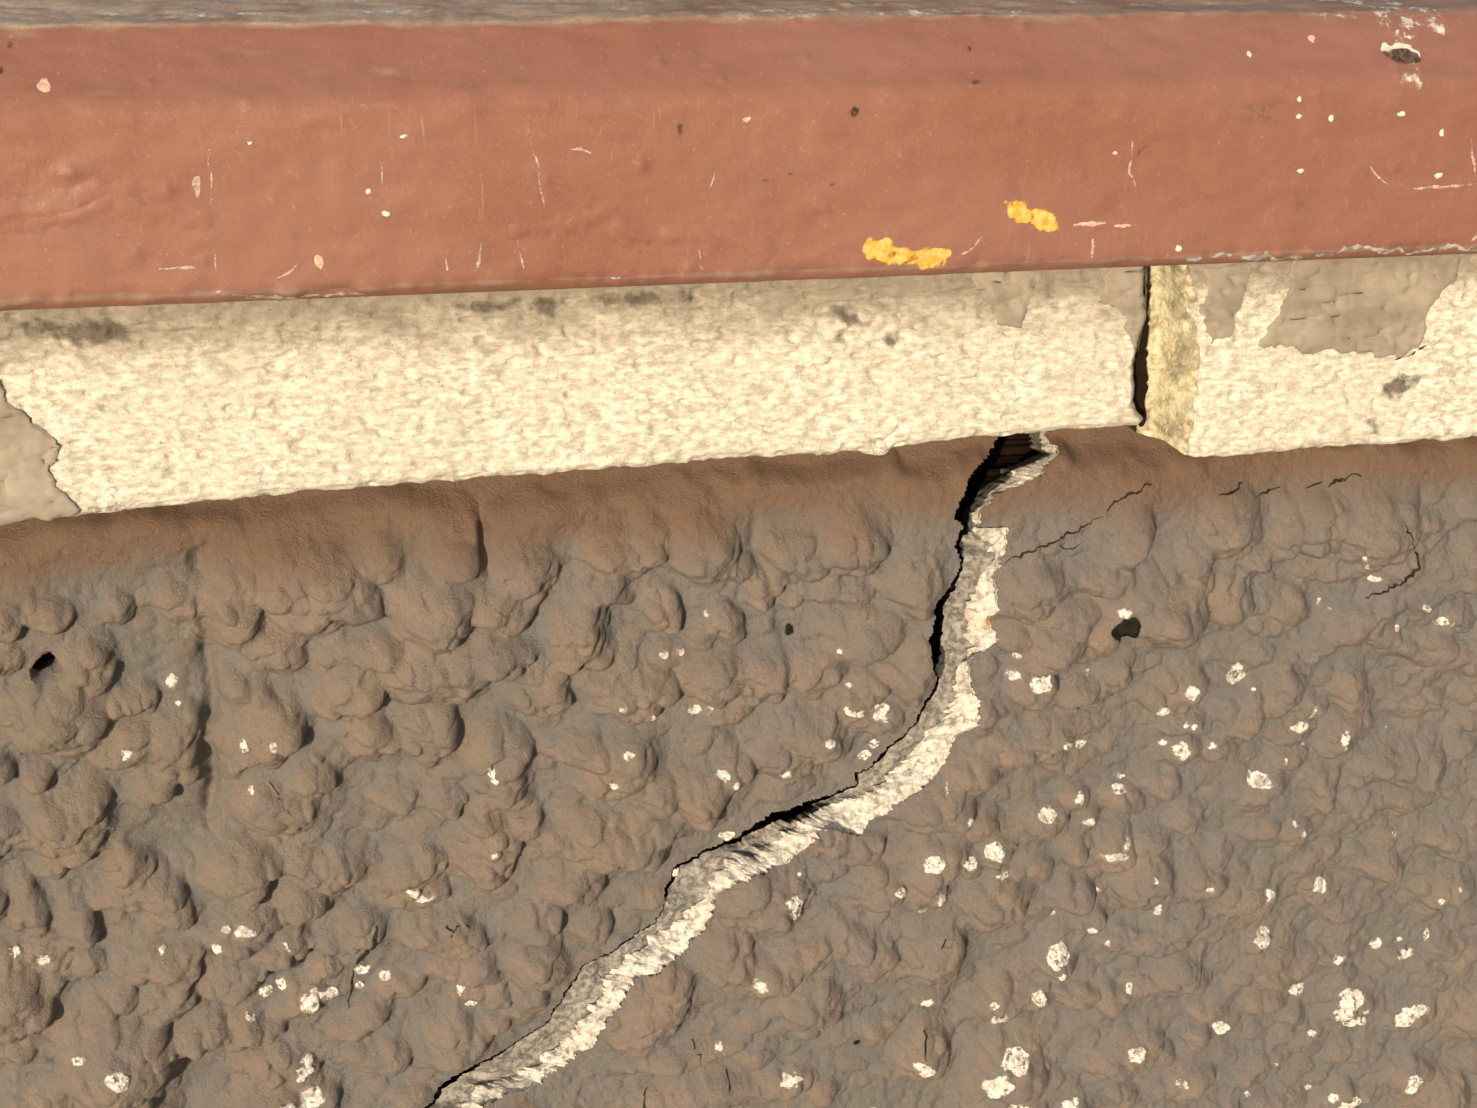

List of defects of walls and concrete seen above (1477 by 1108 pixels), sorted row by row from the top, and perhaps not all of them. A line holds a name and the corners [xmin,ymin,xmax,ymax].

peeling [970,270,1043,328]
peeling [1099,266,1146,349]
crack [1126,265,1200,455]
peeling [1175,244,1477,358]
crack [425,431,1152,1108]
crack [347,926,378,1008]